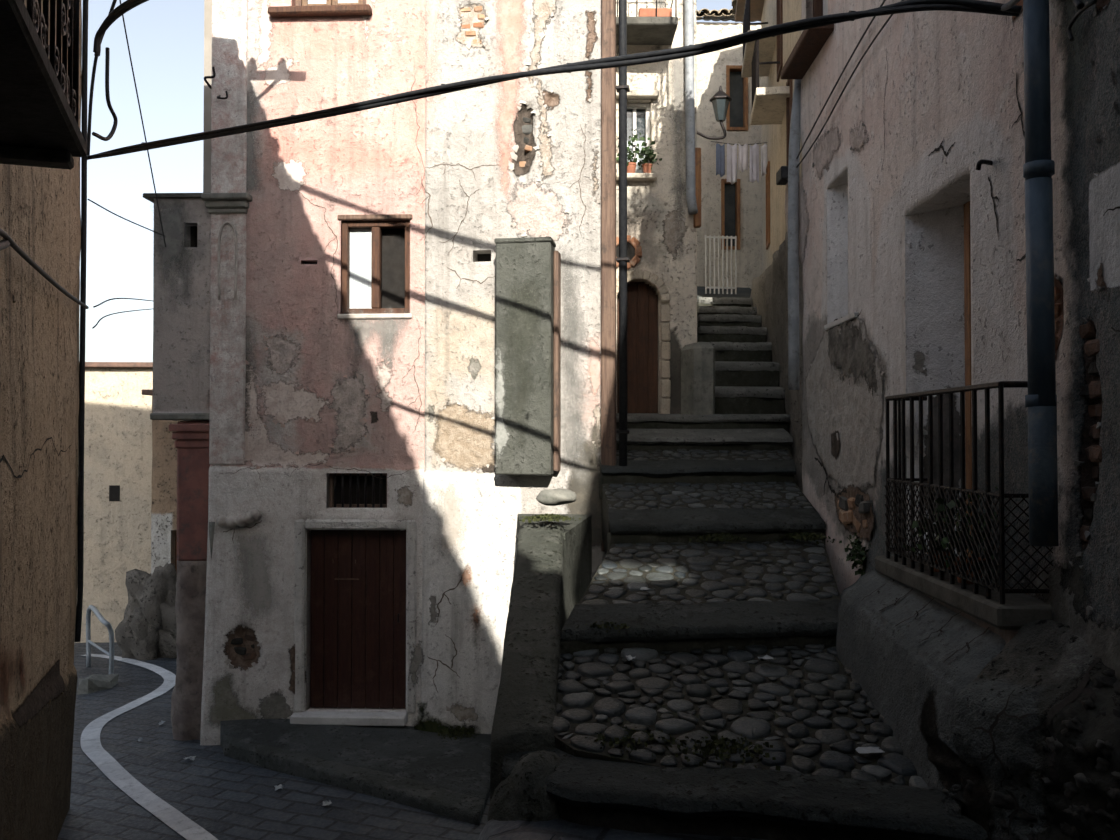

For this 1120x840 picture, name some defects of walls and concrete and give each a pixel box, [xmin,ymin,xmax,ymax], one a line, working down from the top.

peeling [453,0,573,241]
flaking render [1054,273,1064,360]
crack [0,437,71,478]
peeling [245,360,330,470]
flaking render [370,358,393,423]
flaking render [428,349,509,474]
flaking render [806,318,885,541]
flaking render [1074,317,1102,557]
flaking render [223,625,262,671]
crack [428,569,471,692]
flaking render [1021,552,1120,689]
spalling [919,690,1114,840]